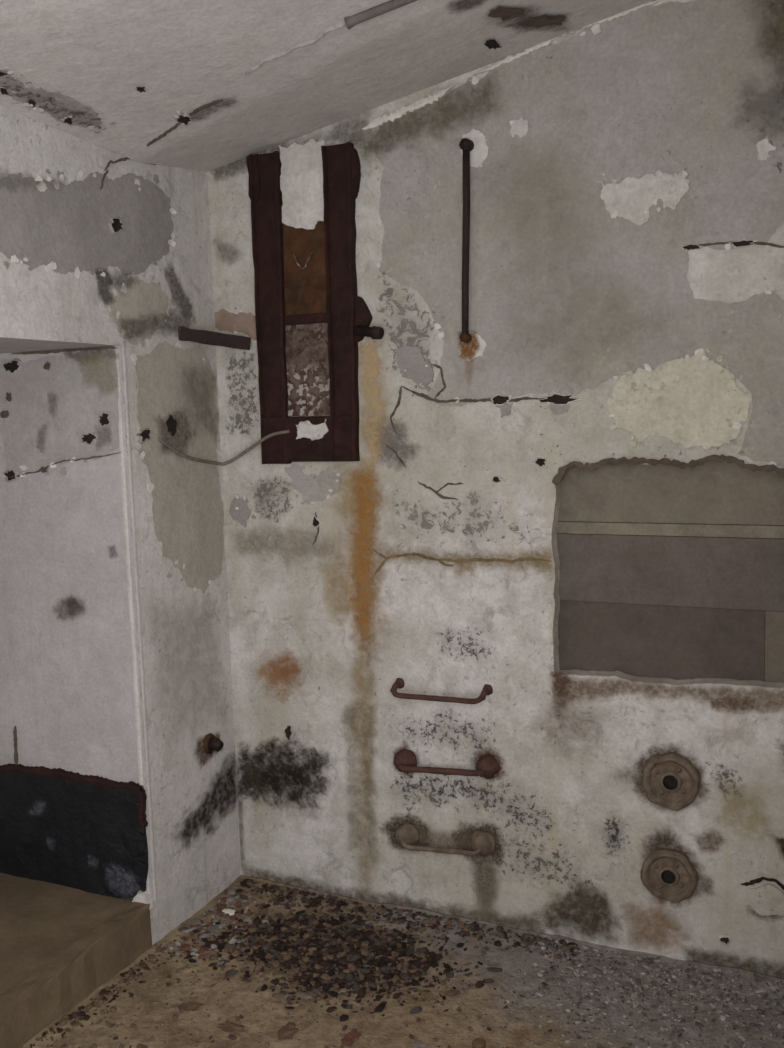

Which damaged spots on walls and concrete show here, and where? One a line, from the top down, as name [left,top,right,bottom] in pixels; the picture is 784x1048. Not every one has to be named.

spalling [0,67,117,134]
peeling [374,0,784,485]
crack [699,240,784,248]
rust [459,332,479,359]
peeling [0,169,257,595]
crack [385,364,544,500]
rust [342,344,384,784]
rust [259,657,299,685]
water stain [181,742,327,859]
water stain [698,834,722,851]
crack [741,877,784,890]
water stain [688,949,784,979]